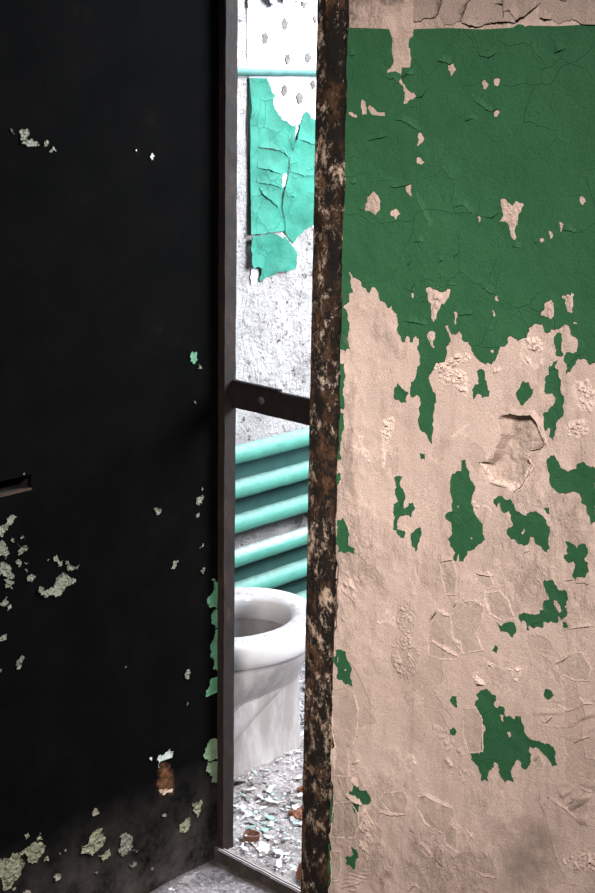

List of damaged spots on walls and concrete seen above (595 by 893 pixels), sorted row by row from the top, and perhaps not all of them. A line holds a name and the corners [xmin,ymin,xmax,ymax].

peeling [243,0,317,397]
peeling [340,0,595,682]
peeling [337,363,346,460]
peeling [0,515,79,610]
peeling [336,518,355,554]
peeling [450,672,557,782]
peeling [0,833,49,893]
peeling [81,828,139,867]
peeling [179,800,203,833]
crack [547,786,592,820]